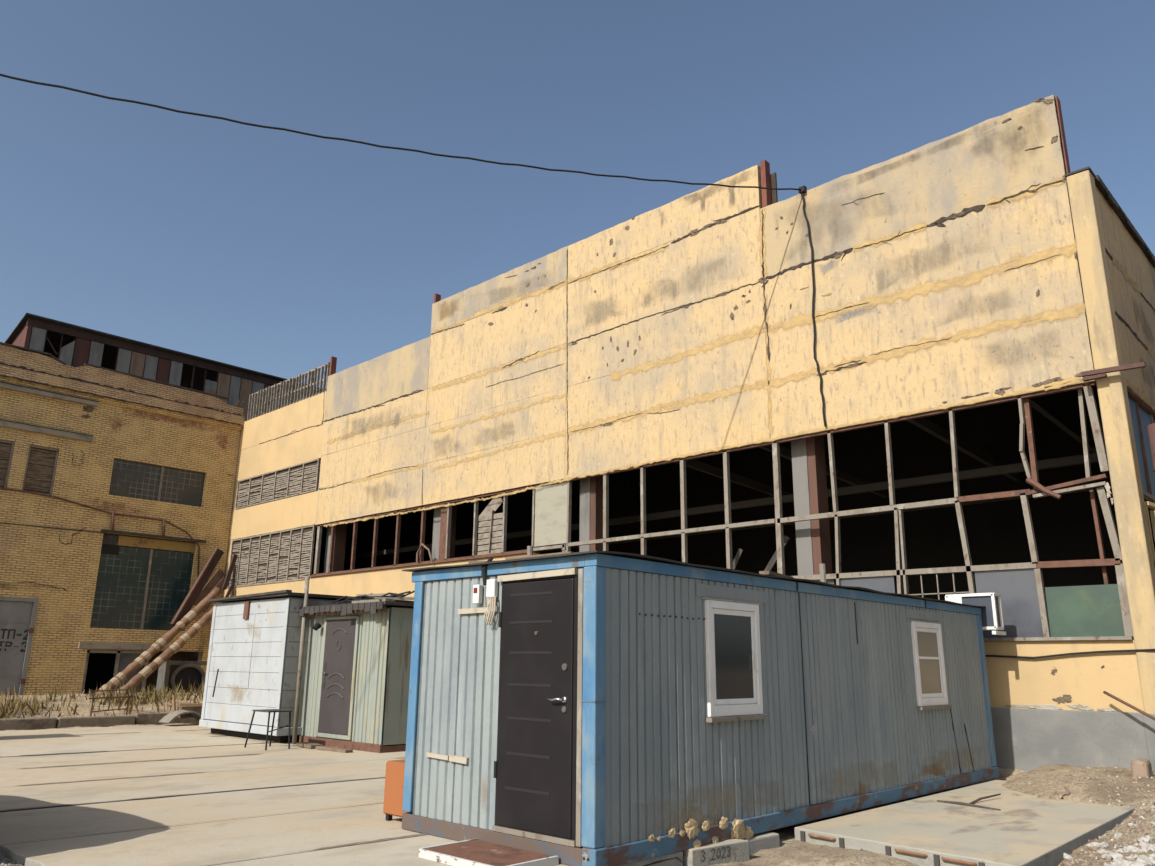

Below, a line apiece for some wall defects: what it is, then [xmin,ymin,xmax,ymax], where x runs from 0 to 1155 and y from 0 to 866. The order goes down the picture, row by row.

crack [488,175,1067,474]
crack [1006,248,1113,316]